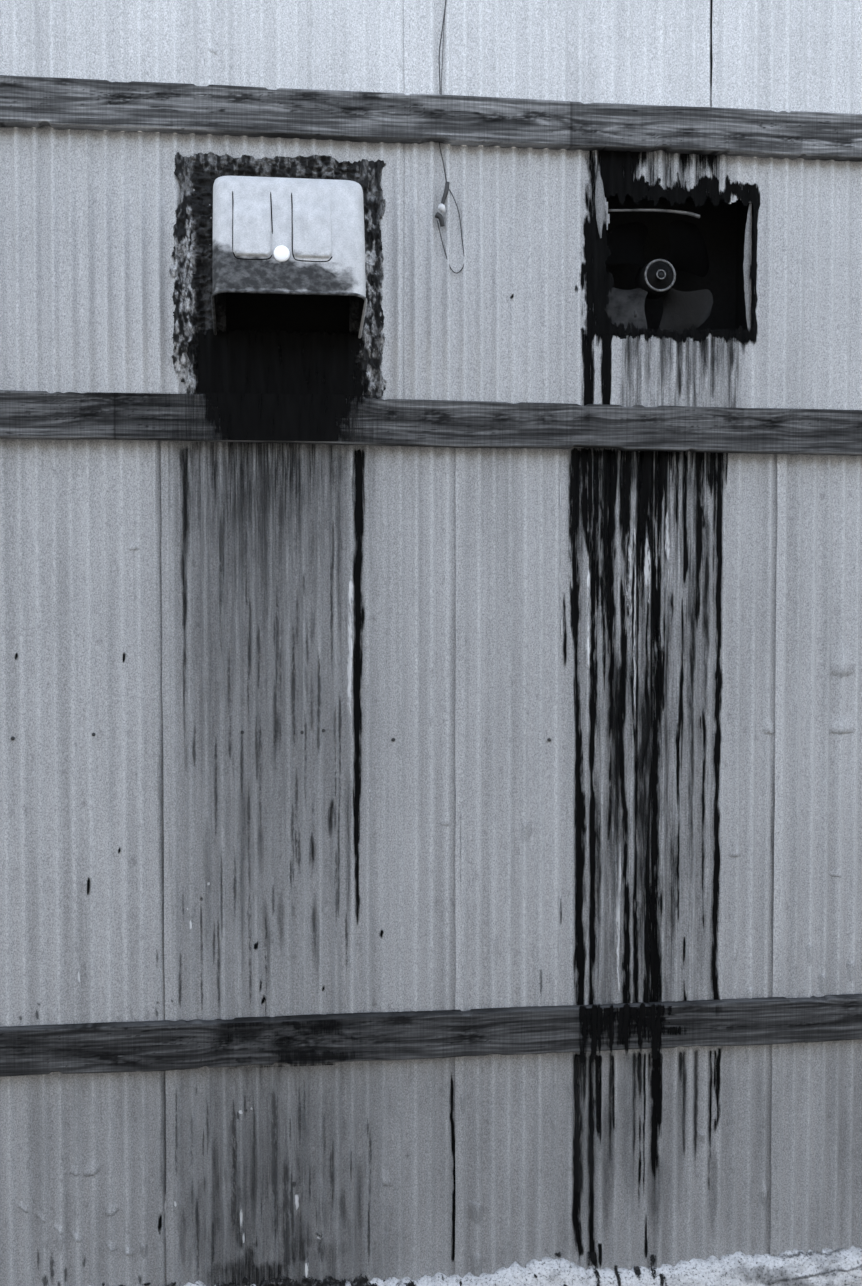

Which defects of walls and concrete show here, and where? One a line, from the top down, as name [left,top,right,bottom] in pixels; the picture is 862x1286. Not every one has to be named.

leakage [582,333,612,406]
leakage [700,316,755,388]
leakage [180,442,337,697]
leakage [215,449,365,946]
leakage [200,857,250,1002]
leakage [560,449,728,1267]
leakage [257,1020,355,1068]